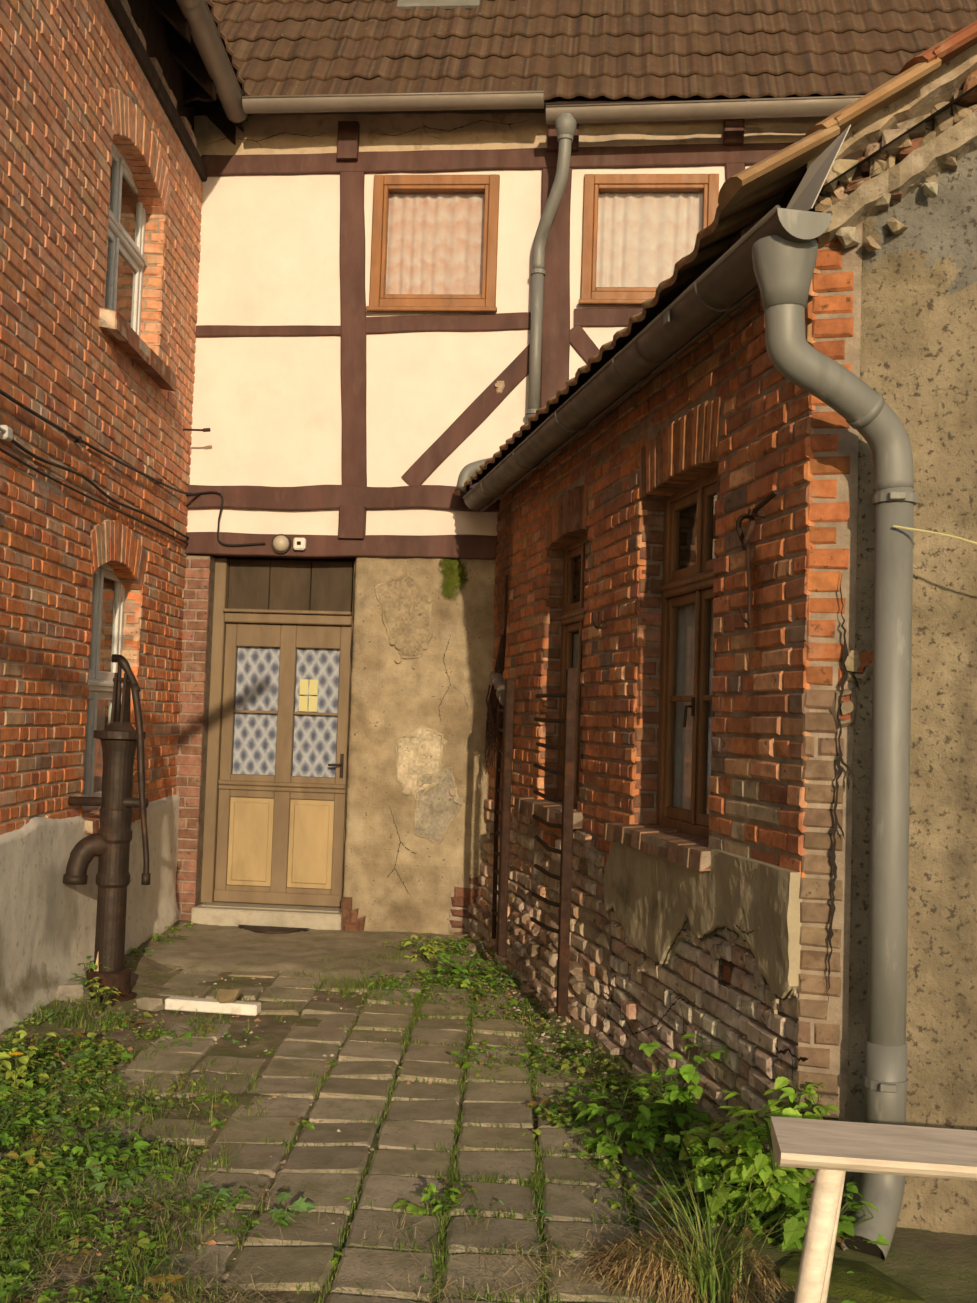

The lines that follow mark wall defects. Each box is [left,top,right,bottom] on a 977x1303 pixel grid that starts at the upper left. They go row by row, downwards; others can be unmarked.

spalling [814,70,977,252]
crack [826,572,860,1002]
spalling [597,908,799,1158]